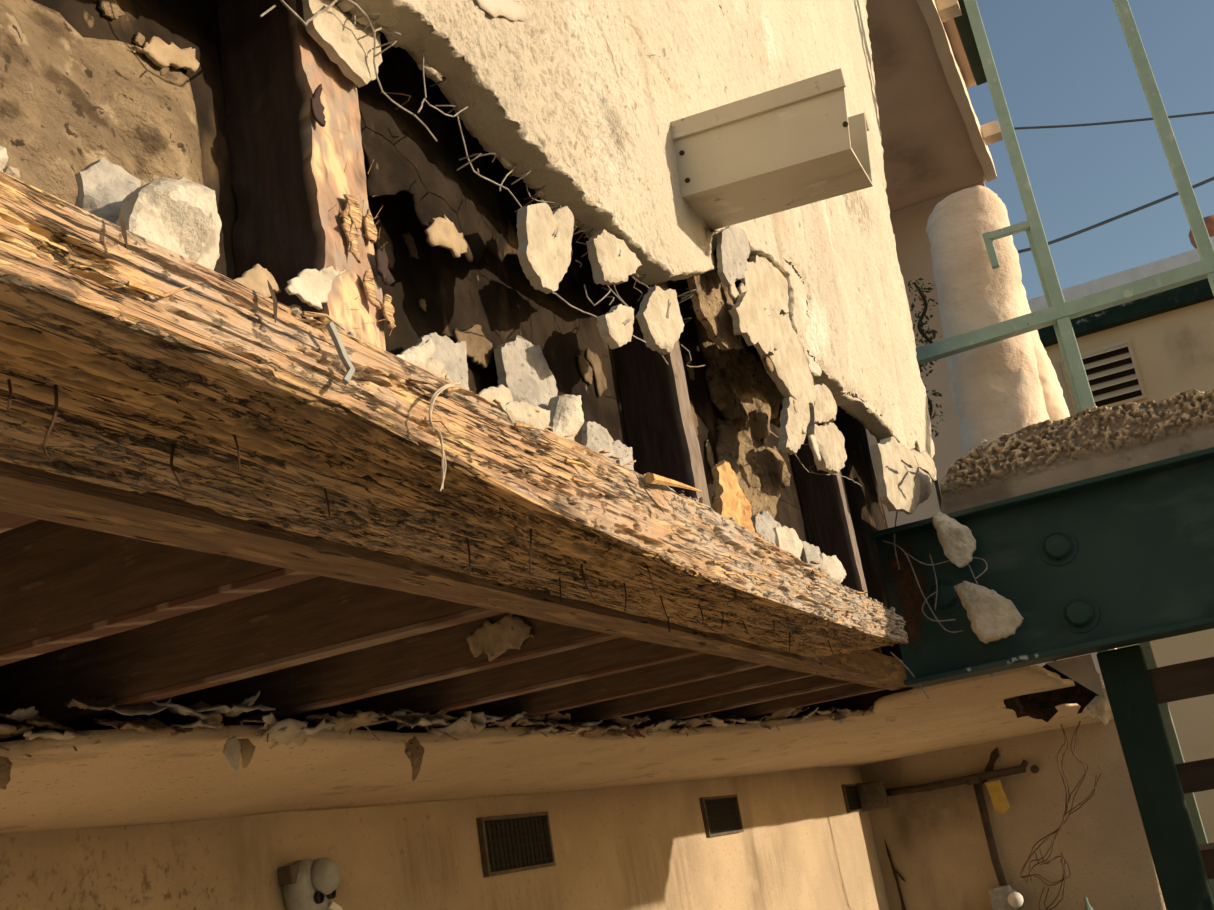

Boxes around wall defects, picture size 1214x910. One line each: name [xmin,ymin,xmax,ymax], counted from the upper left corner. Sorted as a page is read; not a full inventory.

spalling [336,0,376,27]
spalling [417,62,443,82]
peeling [310,84,326,127]
peeling [687,225,821,462]
peeling [477,384,513,404]
rust [887,544,927,643]
spalling [1001,660,1113,725]
peeling [0,690,874,790]
crack [884,839,906,910]